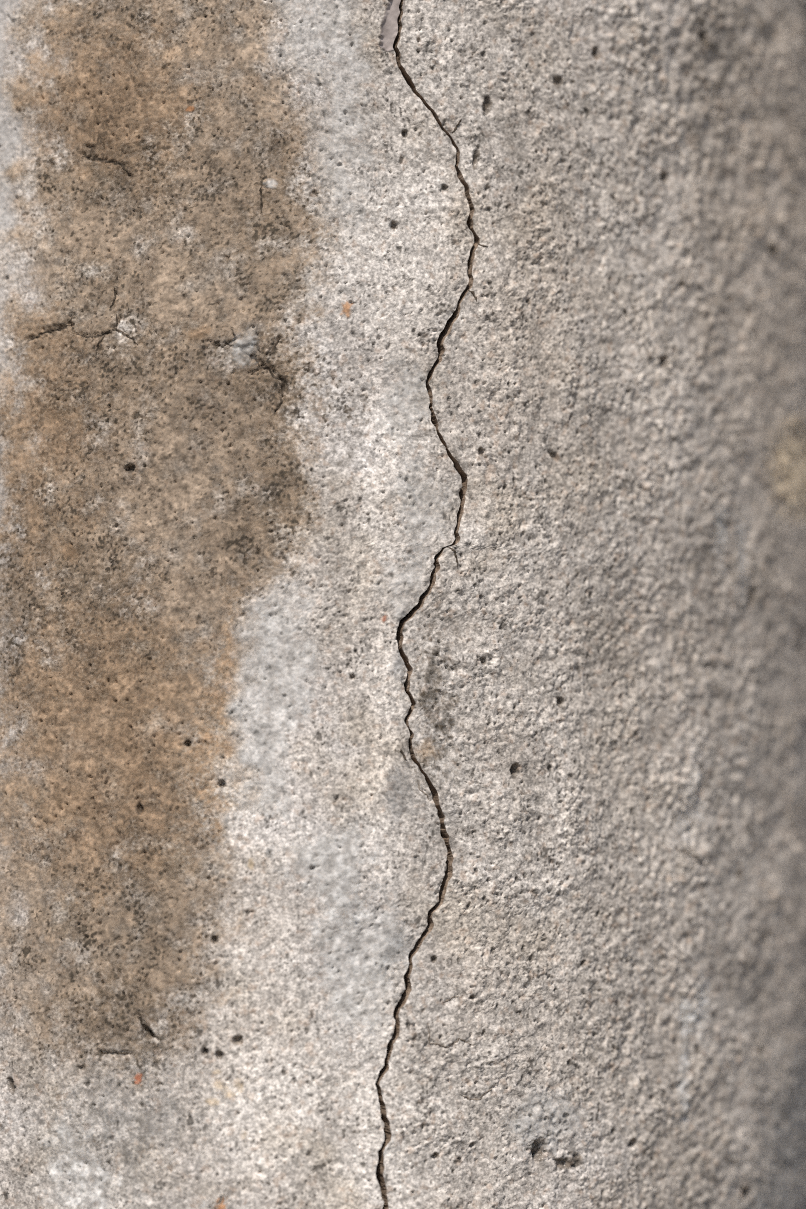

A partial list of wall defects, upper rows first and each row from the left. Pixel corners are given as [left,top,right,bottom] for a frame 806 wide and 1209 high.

damp [0,0,368,1084]
crack [375,0,488,1209]